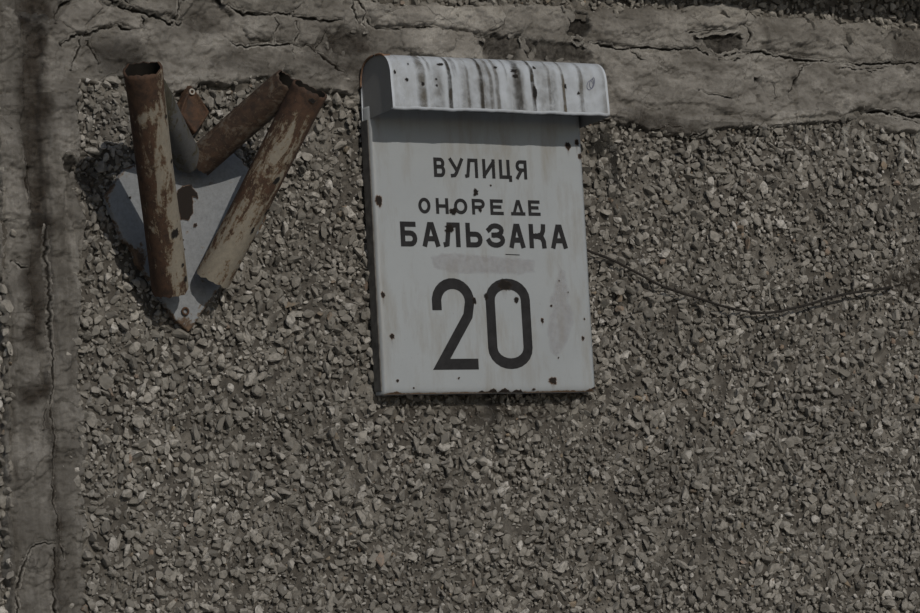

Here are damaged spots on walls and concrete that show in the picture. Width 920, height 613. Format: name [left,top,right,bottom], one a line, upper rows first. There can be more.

crack [52,0,188,70]
crack [221,0,506,77]
spalling [692,28,747,62]
crack [588,6,920,129]
crack [600,117,721,141]
rust [177,185,198,227]
crack [10,223,65,613]